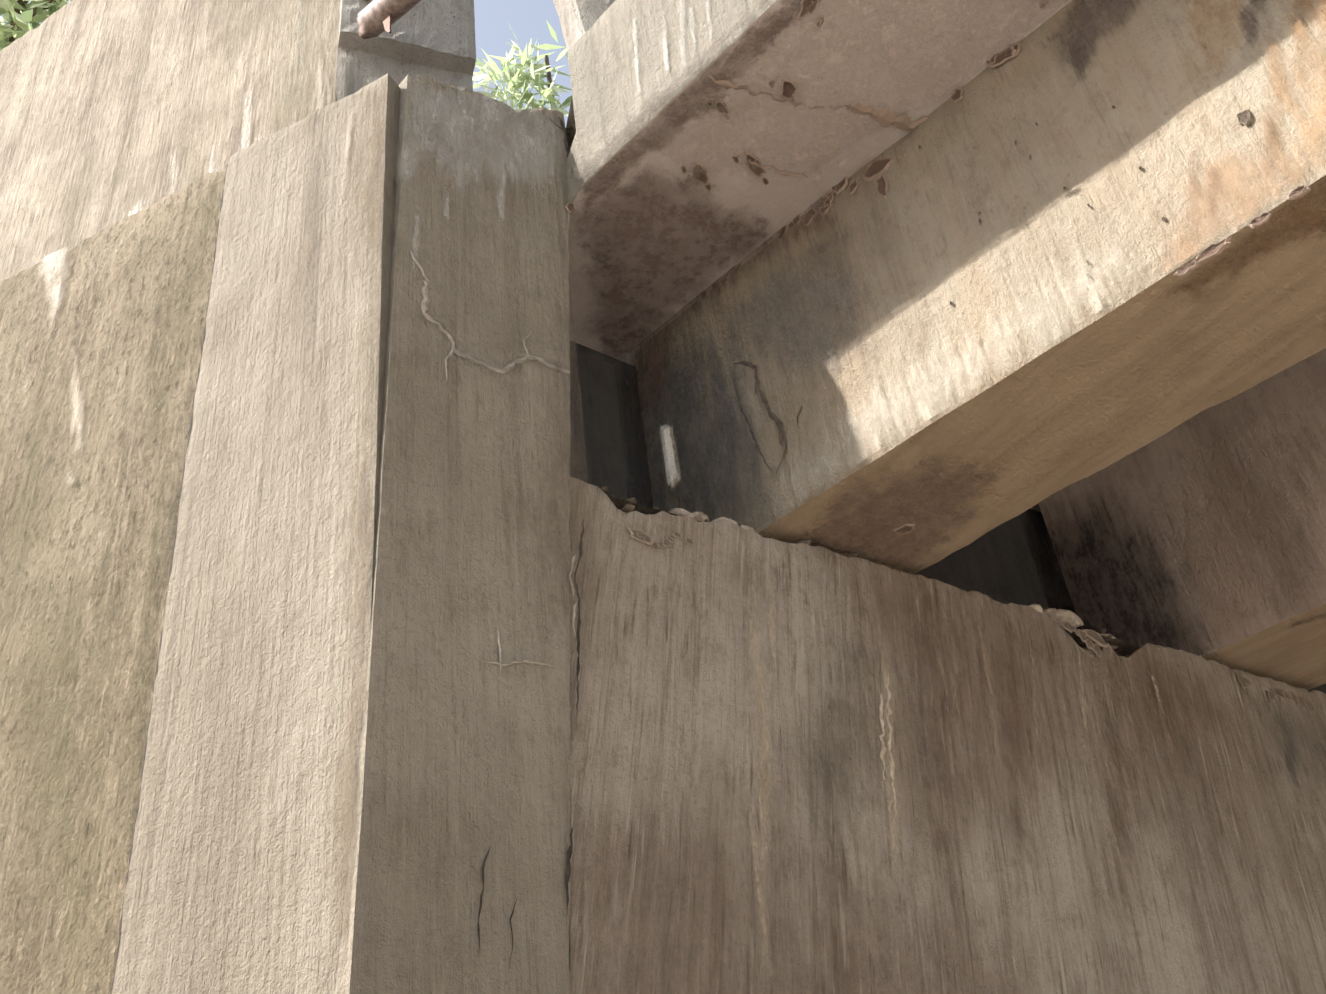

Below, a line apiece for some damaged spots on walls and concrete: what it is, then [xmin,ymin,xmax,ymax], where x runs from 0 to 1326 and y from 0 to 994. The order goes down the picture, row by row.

damp [1056,0,1135,68]
crack [411,251,570,380]
damp [572,0,800,518]
damp [1061,269,1100,312]
crack [733,361,803,482]
spalling [1062,621,1108,666]